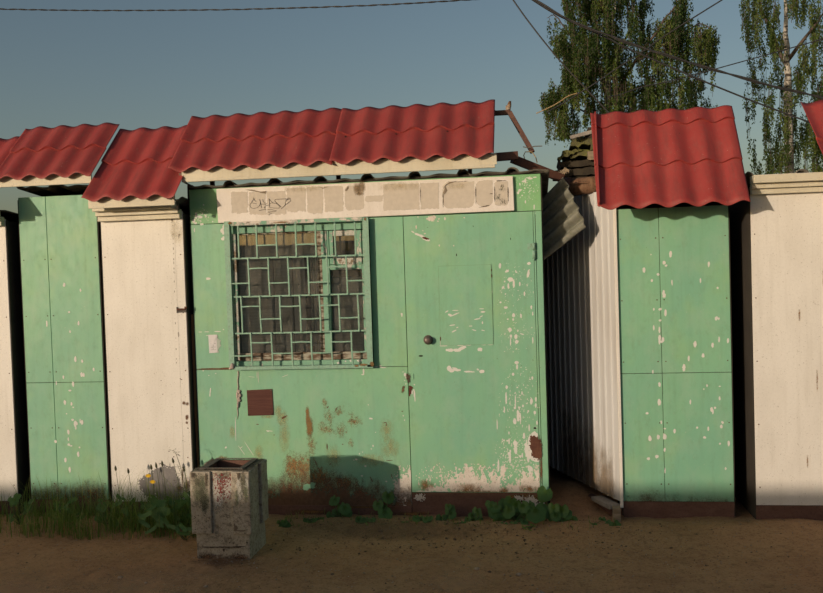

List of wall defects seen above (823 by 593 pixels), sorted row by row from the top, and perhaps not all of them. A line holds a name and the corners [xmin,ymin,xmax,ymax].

peeling [385,262,545,507]
rust [268,408,412,506]
rust [529,427,542,478]